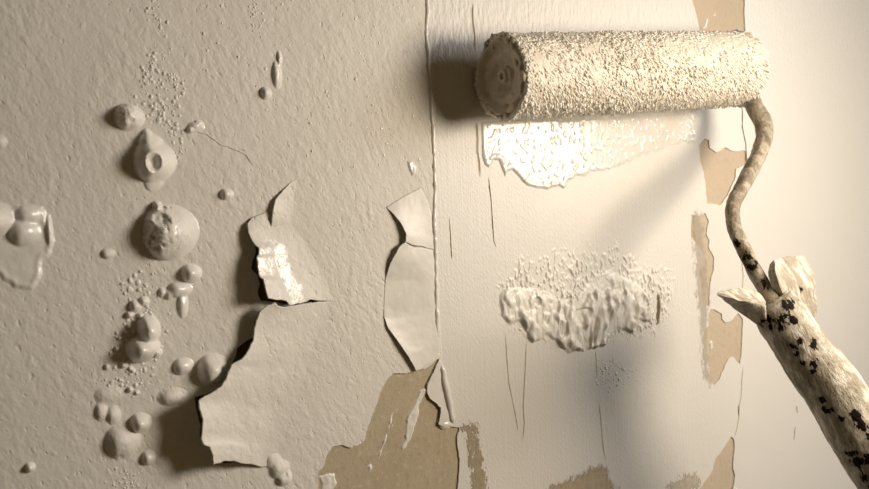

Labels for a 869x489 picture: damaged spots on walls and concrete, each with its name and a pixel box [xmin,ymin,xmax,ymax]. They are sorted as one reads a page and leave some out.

peeling [195,180,335,467]
peeling [318,187,460,489]
peeling [691,139,746,385]
flaking render [550,466,614,489]
peeling [667,437,735,489]